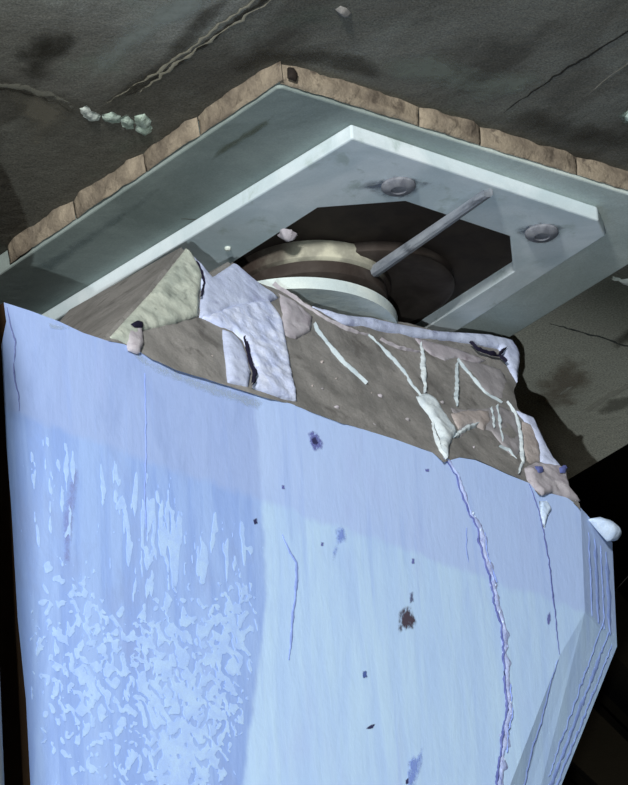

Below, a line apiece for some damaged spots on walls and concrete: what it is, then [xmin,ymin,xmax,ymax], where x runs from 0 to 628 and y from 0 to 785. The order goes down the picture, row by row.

crack [0,84,69,111]
damp [80,105,152,136]
crack [110,0,271,102]
crack [506,30,628,111]
crack [556,325,628,347]
spalling [60,248,581,509]
damp [310,432,322,450]
peeling [31,443,75,538]
rust [399,593,415,630]
crack [444,458,560,785]